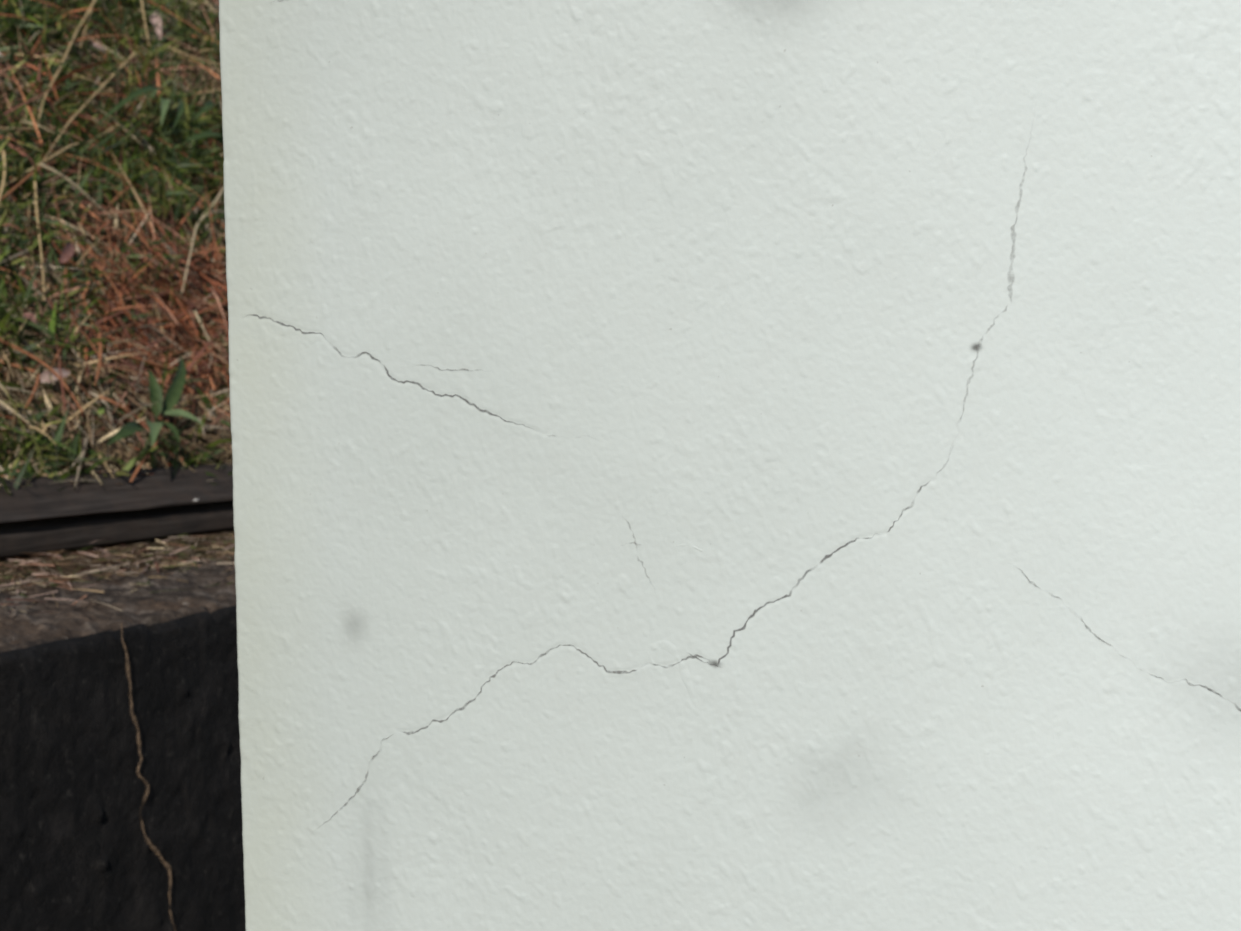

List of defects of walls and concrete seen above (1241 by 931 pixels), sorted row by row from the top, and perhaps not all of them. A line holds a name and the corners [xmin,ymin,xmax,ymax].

crack [250,314,322,334]
crack [362,352,511,422]
crack [373,485,925,757]
crack [122,626,173,920]